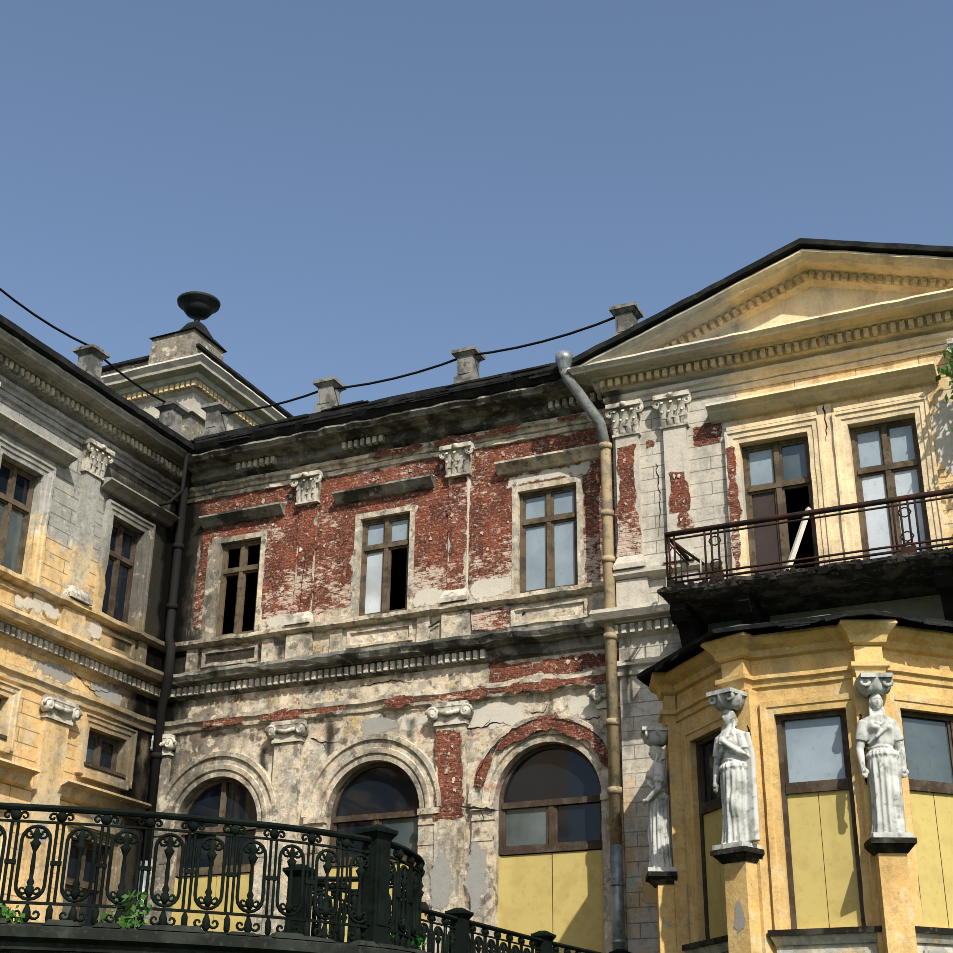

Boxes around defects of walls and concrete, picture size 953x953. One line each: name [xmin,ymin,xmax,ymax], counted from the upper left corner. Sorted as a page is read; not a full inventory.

flaking render [193,423,655,631]
flaking render [668,472,694,530]
flaking render [692,422,743,570]
flaking render [931,400,953,475]
flaking render [32,661,73,684]
flaking render [360,653,608,821]